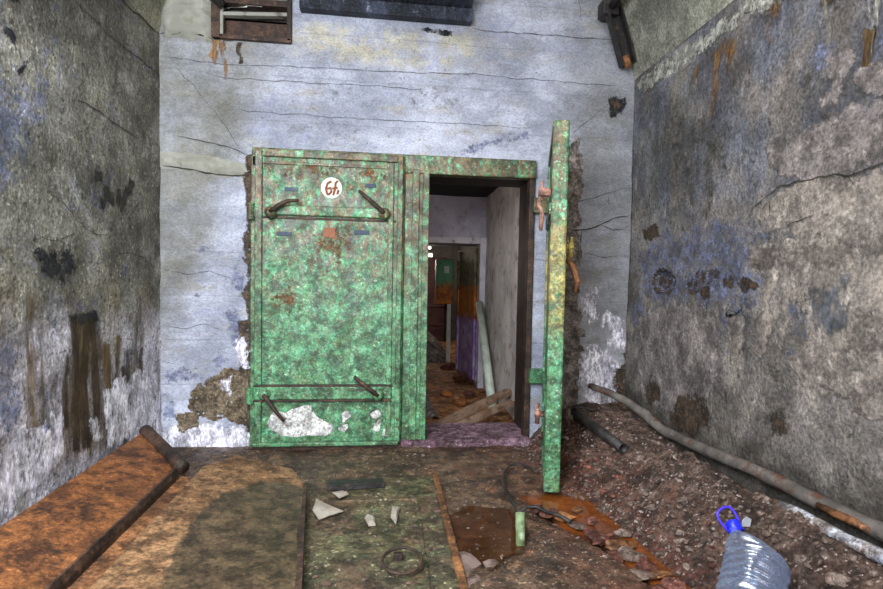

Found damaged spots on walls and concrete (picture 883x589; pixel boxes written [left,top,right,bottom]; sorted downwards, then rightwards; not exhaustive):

corrosion [210,39,243,78]
spalling [243,154,252,207]
corrosion [281,162,338,180]
crack [745,162,883,225]
spalling [163,219,251,445]
corrosion [269,286,307,315]
corrosion [314,226,353,276]
spalling [562,137,585,413]
efflorescence [576,286,626,404]
flaking render [631,38,883,420]